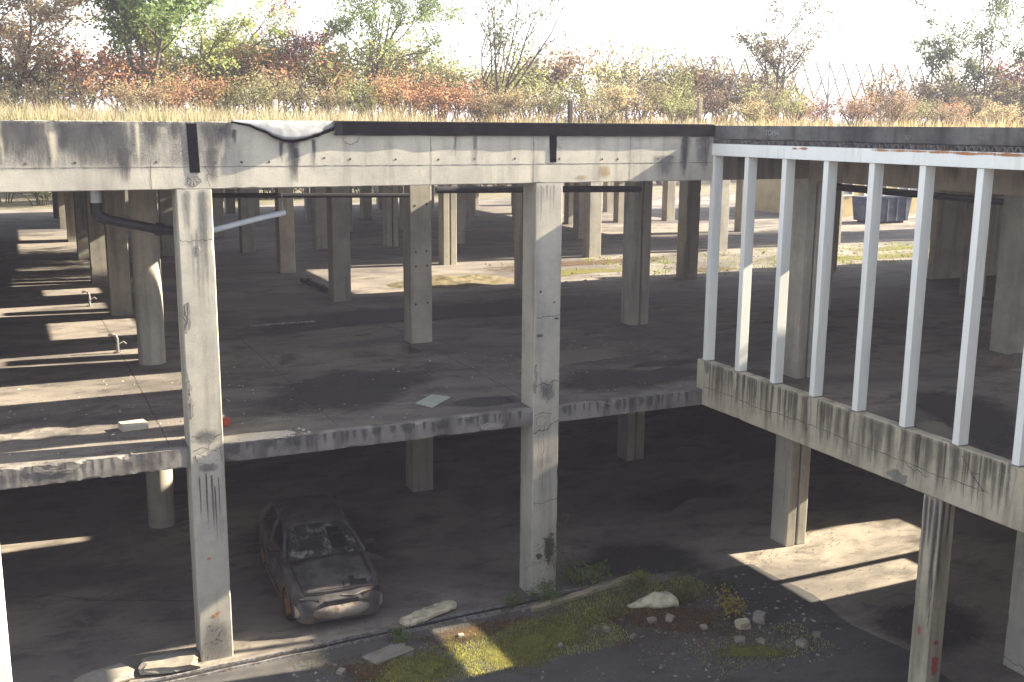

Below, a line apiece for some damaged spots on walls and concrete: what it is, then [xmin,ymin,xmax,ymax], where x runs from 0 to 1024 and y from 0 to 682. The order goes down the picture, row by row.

damp [0,121,157,175]
damp [202,122,236,176]
damp [279,142,298,172]
damp [265,370,424,412]
damp [199,431,216,443]
damp [229,396,522,453]
crack [705,387,989,494]
damp [709,364,1015,492]
damp [8,463,66,481]
damp [199,465,220,521]